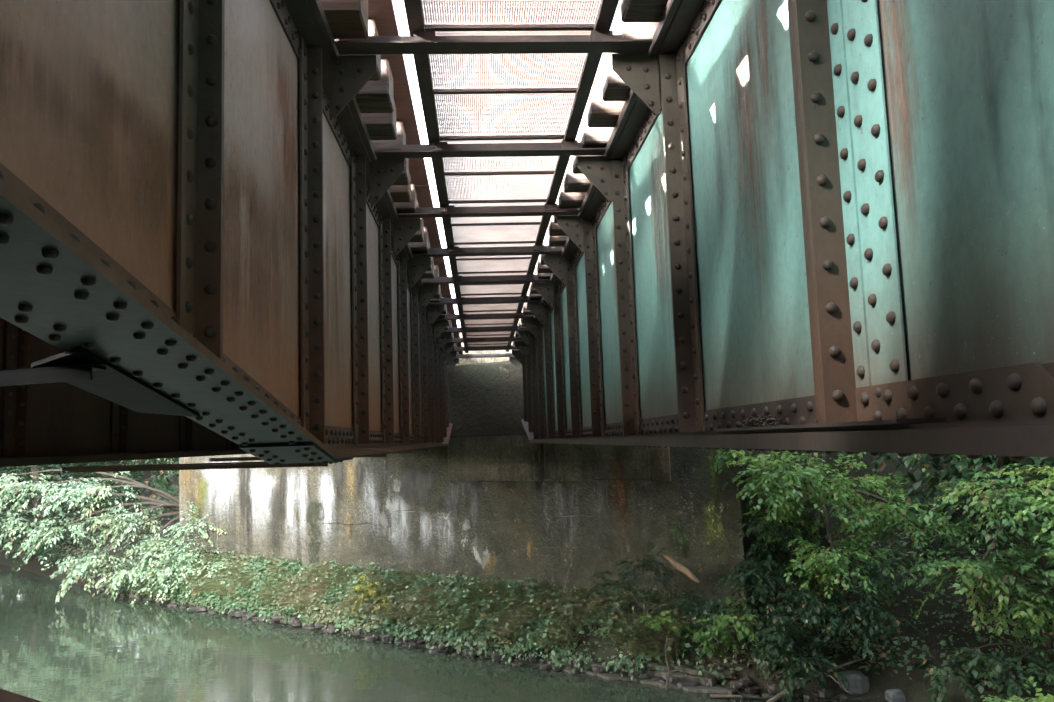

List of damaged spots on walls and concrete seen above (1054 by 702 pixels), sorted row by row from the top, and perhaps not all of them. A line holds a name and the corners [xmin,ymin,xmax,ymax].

rust [878,0,909,156]
damp [322,462,343,520]
damp [356,458,431,537]
damp [421,477,481,541]